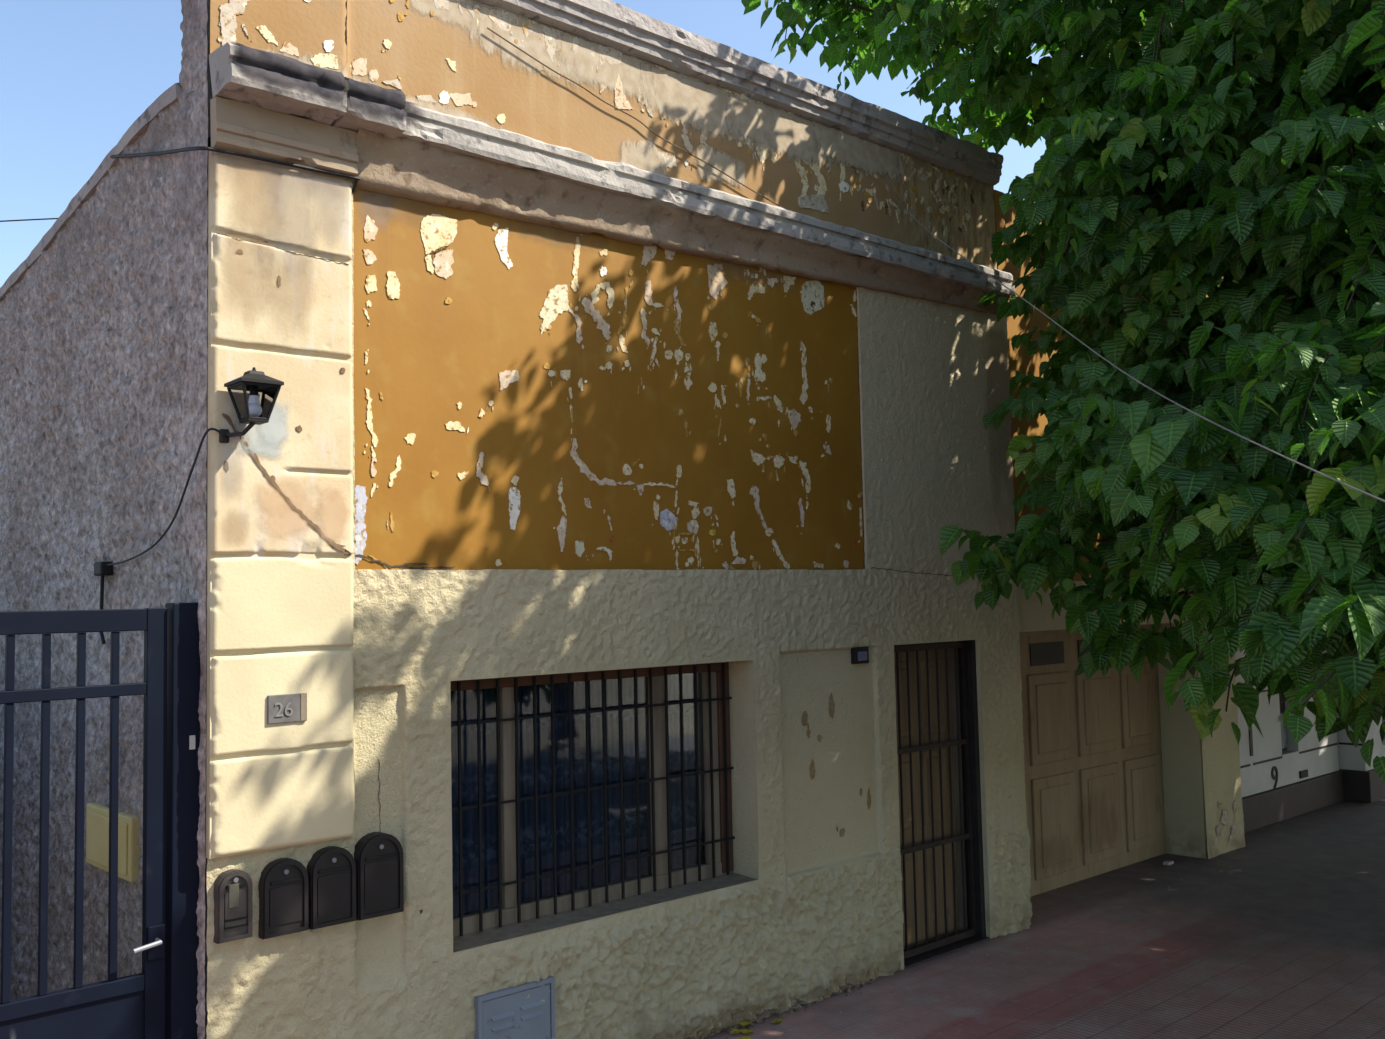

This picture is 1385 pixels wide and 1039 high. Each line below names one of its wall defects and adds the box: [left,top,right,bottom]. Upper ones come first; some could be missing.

peeling [217,0,477,107]
leakage [232,42,502,129]
peeling [430,0,710,169]
peeling [728,134,974,236]
peeling [363,215,400,325]
peeling [420,214,458,279]
peeling [492,223,513,270]
peeling [445,370,519,434]
peeling [539,234,833,570]
peeling [330,349,416,569]
peeling [457,452,490,492]
peeling [508,475,521,530]